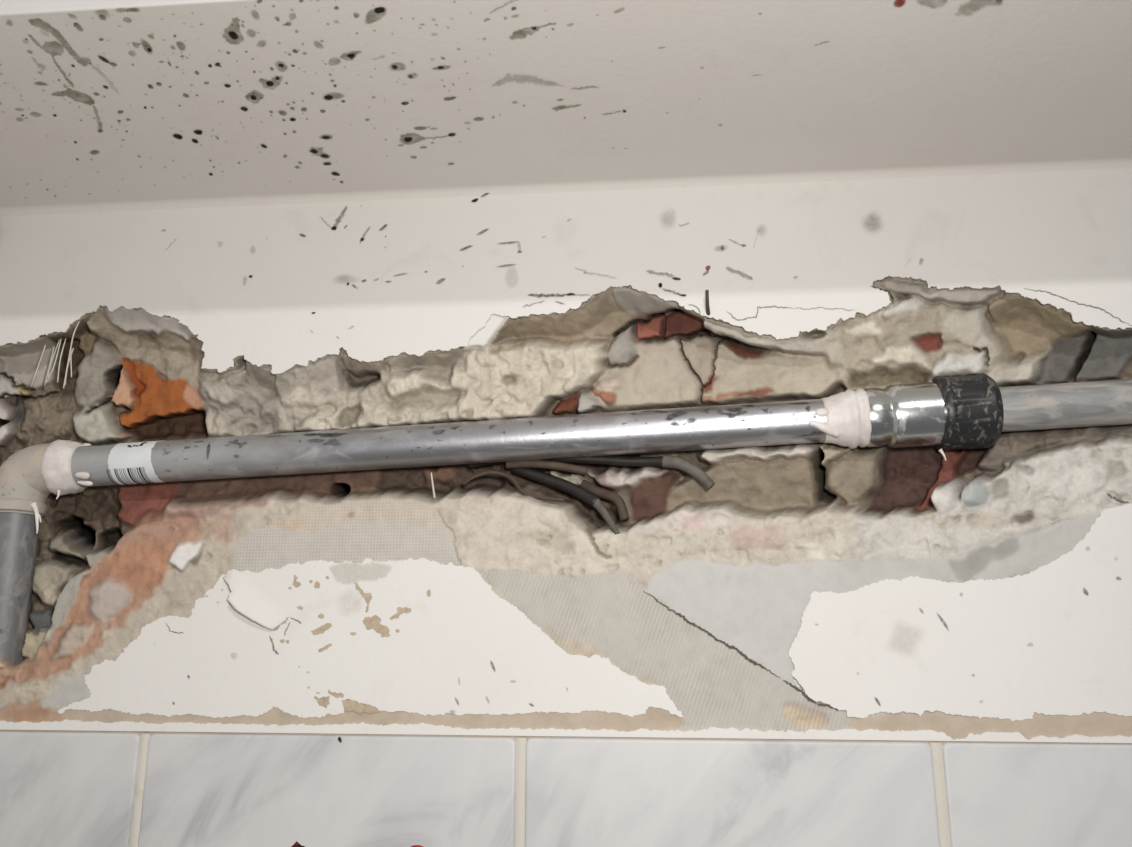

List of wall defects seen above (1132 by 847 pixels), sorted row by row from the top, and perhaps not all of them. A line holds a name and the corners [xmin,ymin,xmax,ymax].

spalling [0,276,1132,466]
flaking render [0,424,1132,746]